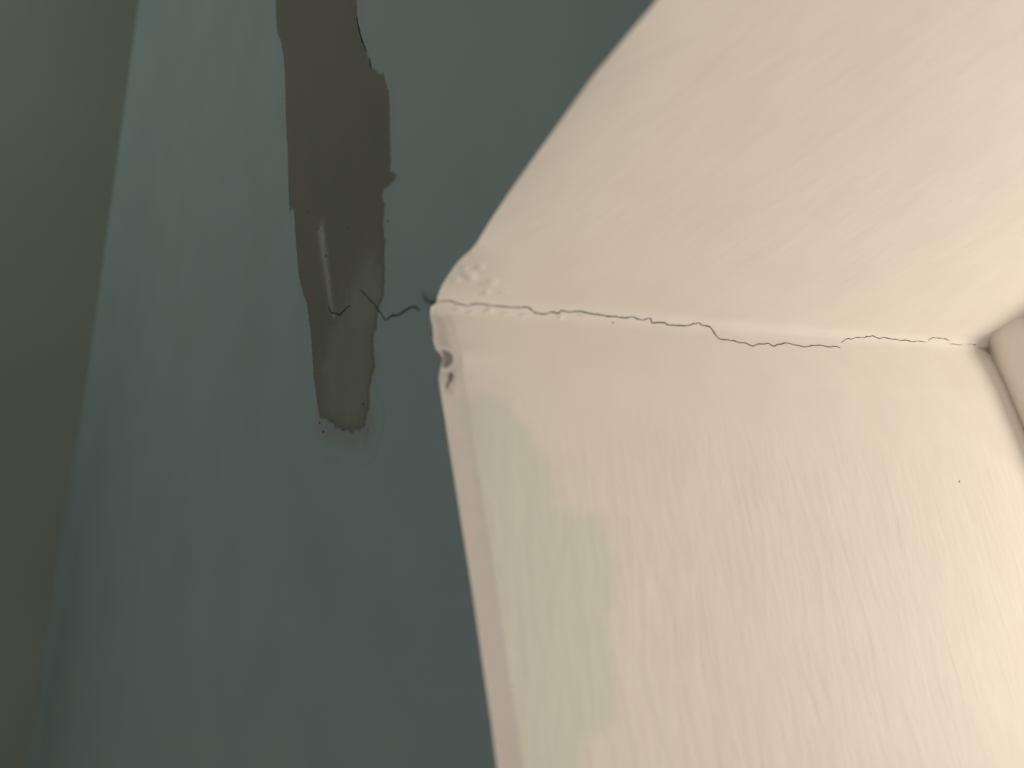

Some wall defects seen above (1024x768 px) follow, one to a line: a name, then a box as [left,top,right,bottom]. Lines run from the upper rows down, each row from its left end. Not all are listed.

peeling [273,0,401,468]
crack [328,290,975,348]